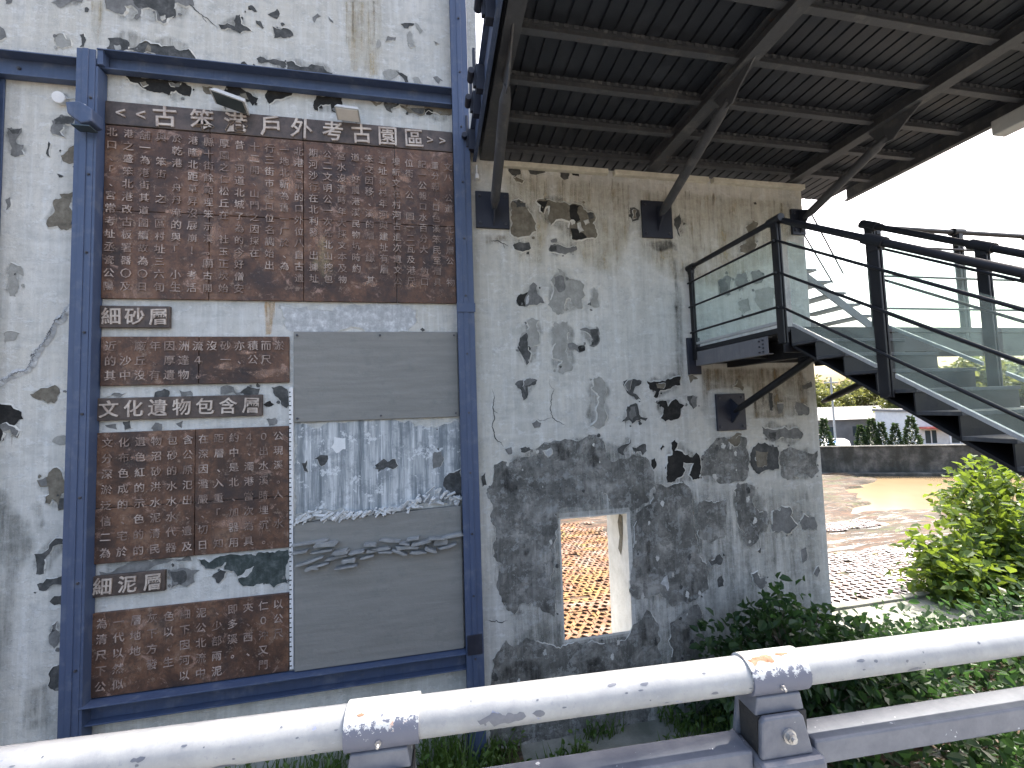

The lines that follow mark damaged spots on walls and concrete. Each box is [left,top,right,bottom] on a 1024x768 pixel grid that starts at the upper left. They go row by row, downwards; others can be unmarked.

peeling [103,0,194,26]
peeling [124,76,293,106]
peeling [45,192,73,231]
peeling [509,198,600,401]
crack [0,304,69,387]
peeling [0,402,23,442]
peeling [470,375,821,746]